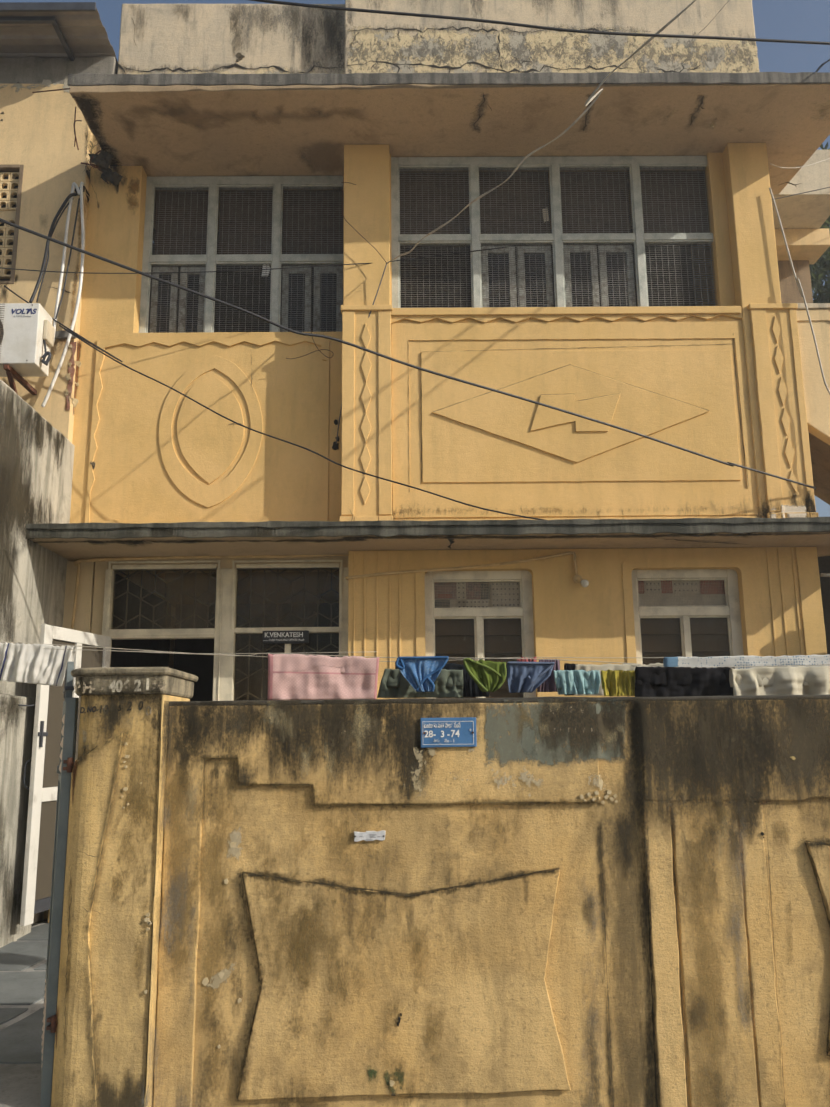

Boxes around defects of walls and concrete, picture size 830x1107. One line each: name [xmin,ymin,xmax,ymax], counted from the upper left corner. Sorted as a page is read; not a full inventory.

damp [236,5,352,57]
crack [117,19,704,131]
peeling [130,25,759,74]
damp [27,412,64,453]
damp [0,467,50,537]
damp [388,702,425,799]
damp [79,679,253,1012]
damp [589,825,607,933]
damp [668,699,786,952]
damp [619,818,658,1104]
damp [671,824,726,1107]
damp [594,1019,614,1107]